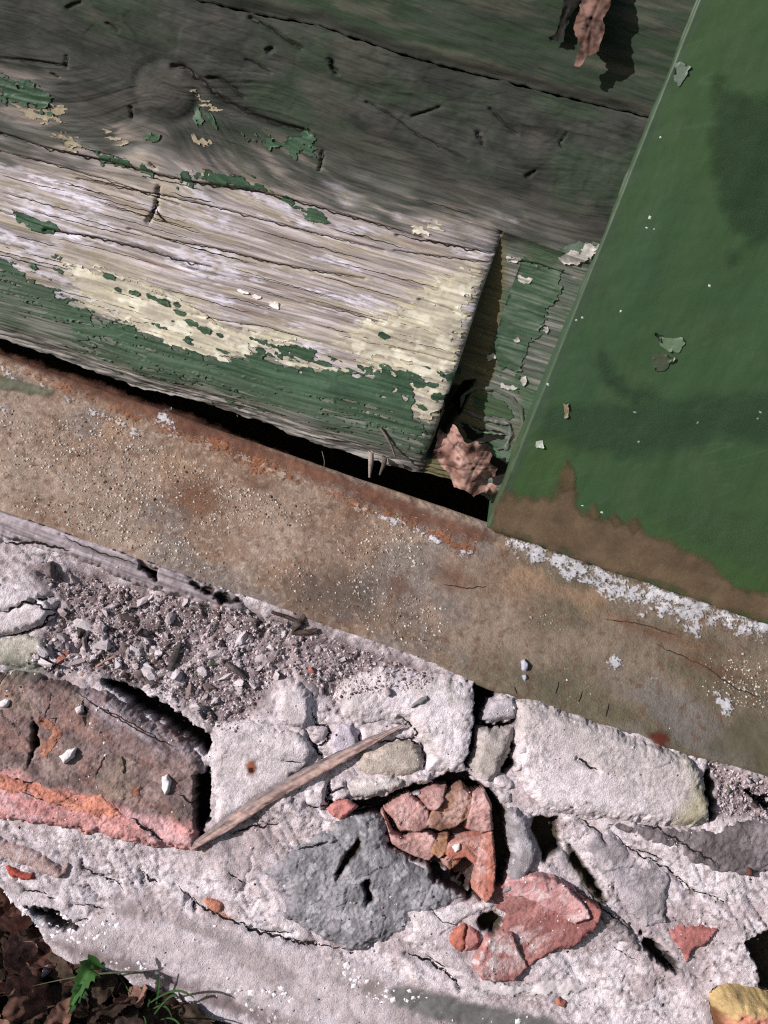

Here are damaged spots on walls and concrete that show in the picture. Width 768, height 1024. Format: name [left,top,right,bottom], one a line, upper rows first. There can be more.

peeling [673,62,691,86]
peeling [652,332,685,372]
peeling [154,412,177,437]
rust [0,354,487,559]
peeling [354,503,441,544]
peeling [505,539,768,638]
peeling [713,691,734,716]
spalling [36,717,77,764]
spalling [0,774,120,818]
spalling [162,774,172,795]
crack [579,818,734,905]
crack [81,861,346,950]